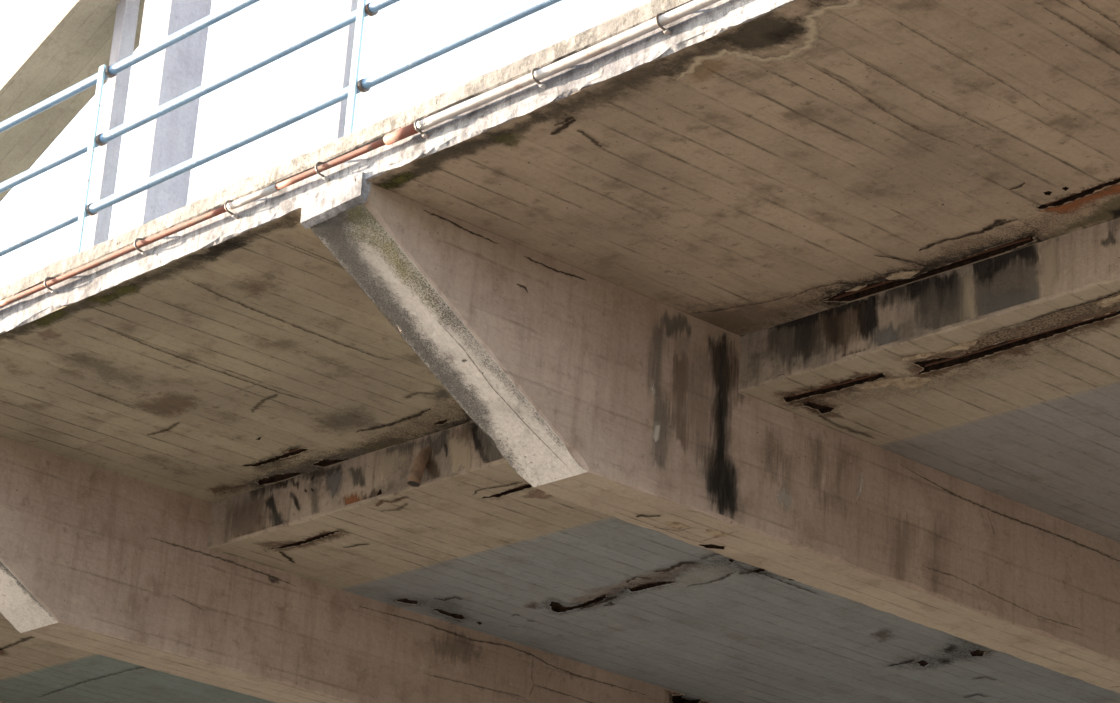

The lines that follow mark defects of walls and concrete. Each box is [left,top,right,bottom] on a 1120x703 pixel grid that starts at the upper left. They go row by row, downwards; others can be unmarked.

spalling [820,234,1043,308]
water stain [769,204,1100,365]
water stain [223,206,503,527]
spalling [786,291,1120,412]
spalling [212,438,414,493]
spalling [545,513,816,614]
water stain [707,335,739,518]
crack [905,467,1119,561]
spalling [669,693,707,703]